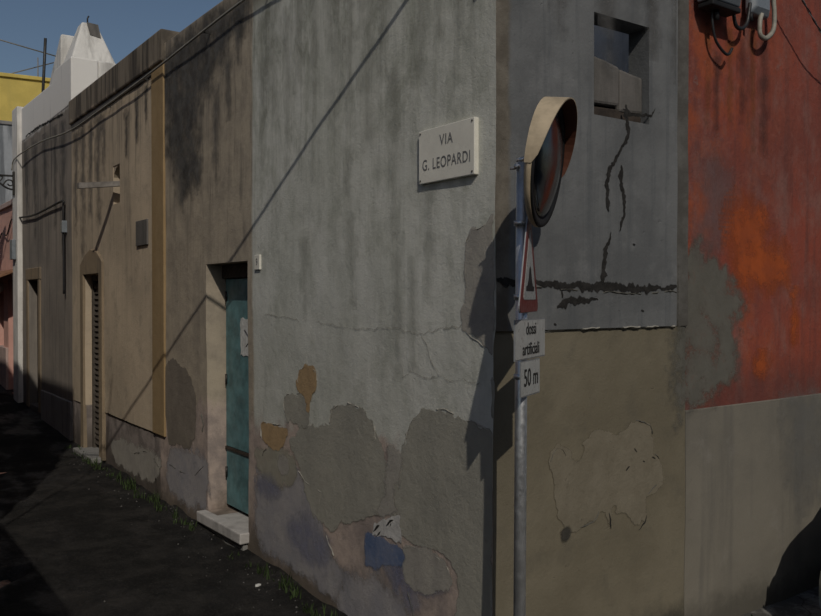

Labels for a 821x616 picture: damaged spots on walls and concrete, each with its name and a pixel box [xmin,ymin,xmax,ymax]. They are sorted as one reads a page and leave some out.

water stain [164,0,249,202]
crack [536,104,677,309]
peeling [460,214,495,355]
crack [496,277,516,287]
peeling [260,421,288,455]
peeling [296,364,318,412]
peeling [254,467,453,616]